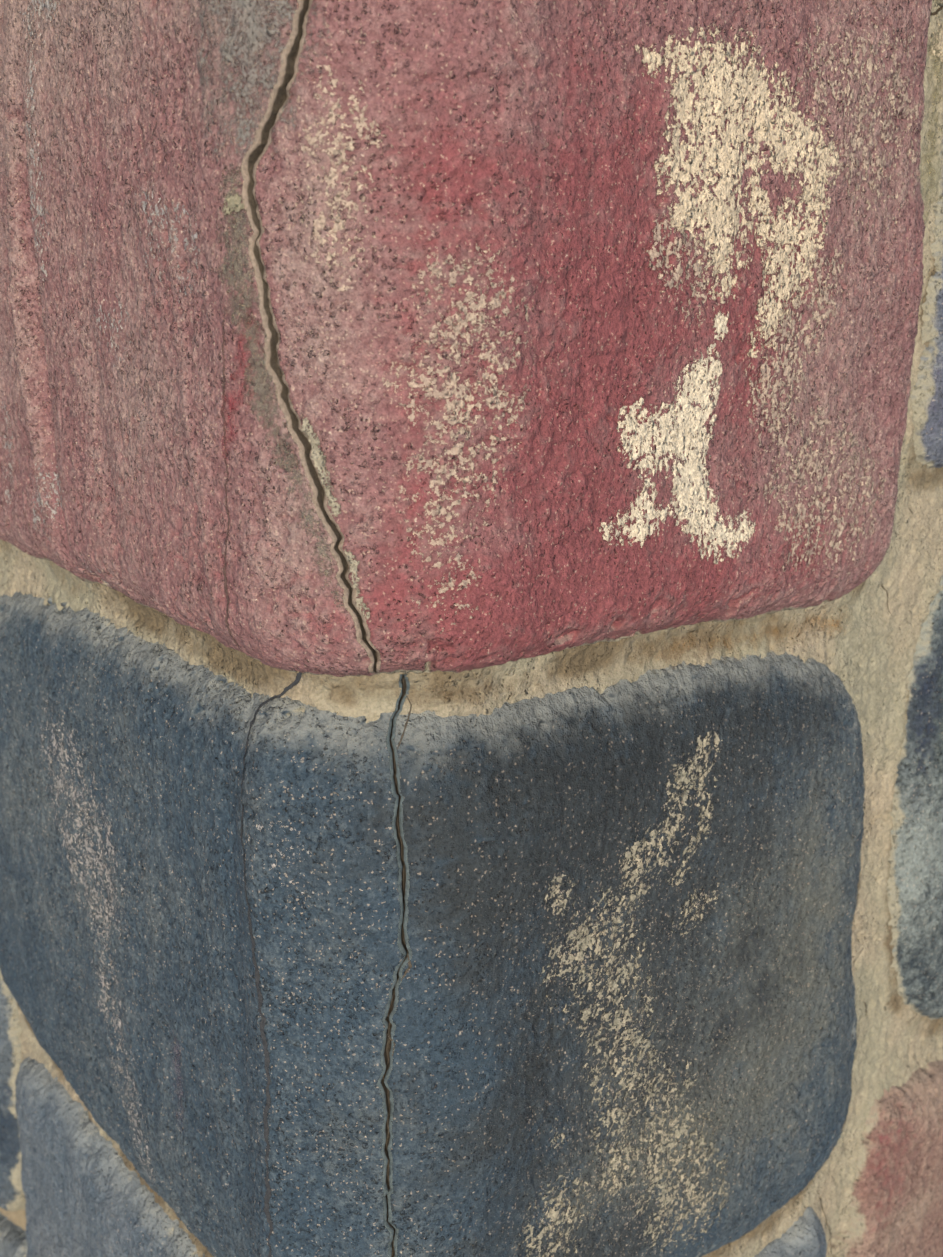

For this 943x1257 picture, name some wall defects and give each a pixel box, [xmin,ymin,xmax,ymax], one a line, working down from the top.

peeling [599,7,924,585]
crack [218,0,413,1257]
peeling [519,731,734,1257]